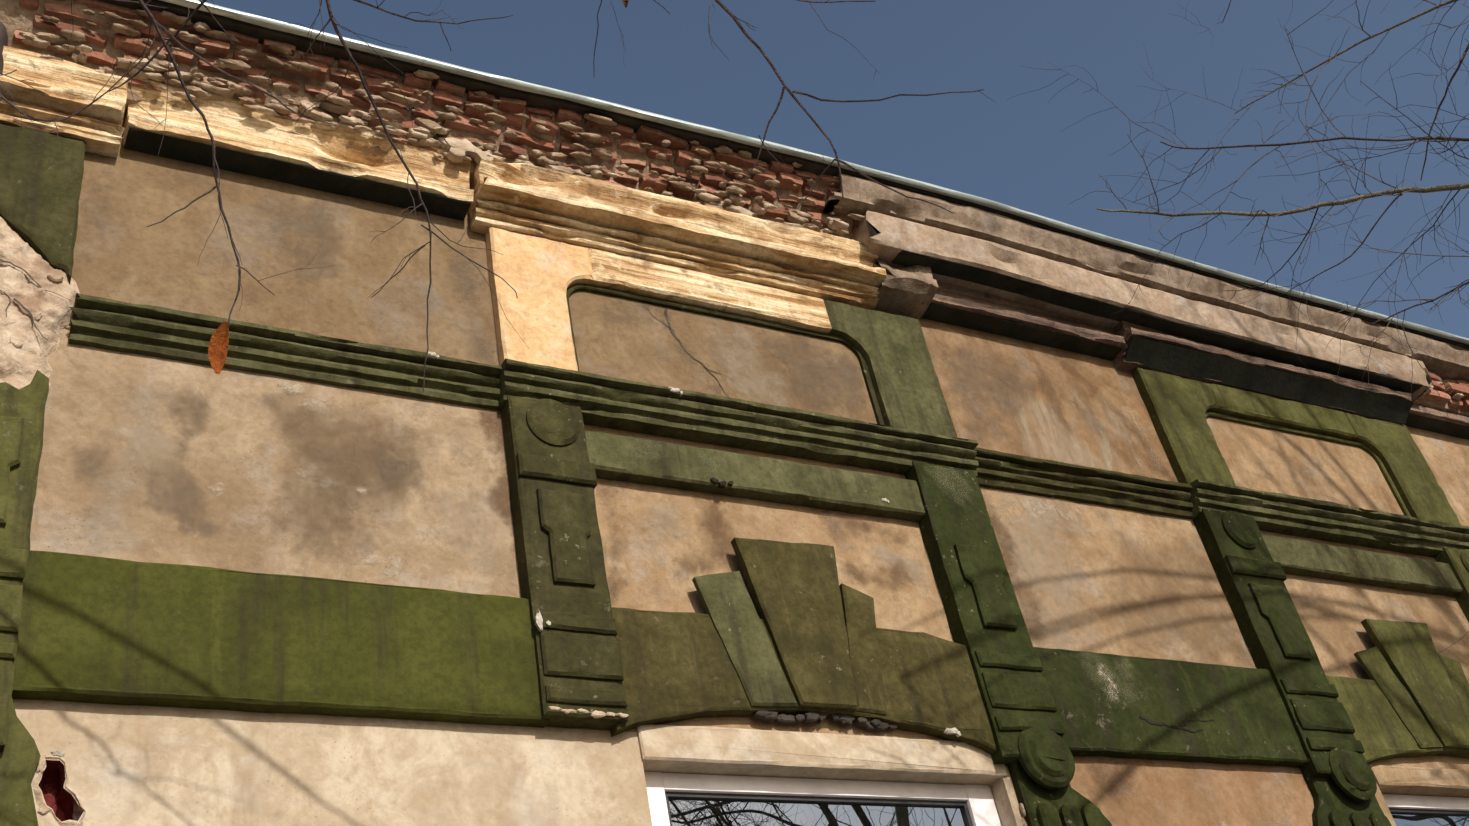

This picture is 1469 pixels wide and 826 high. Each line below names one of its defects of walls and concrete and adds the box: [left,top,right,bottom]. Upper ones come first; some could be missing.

flaking render [13,0,865,240]
flaking render [0,216,80,389]
water stain [482,410,504,444]
spalling [1413,368,1469,417]
water stain [492,478,512,517]
spalling [31,749,86,826]